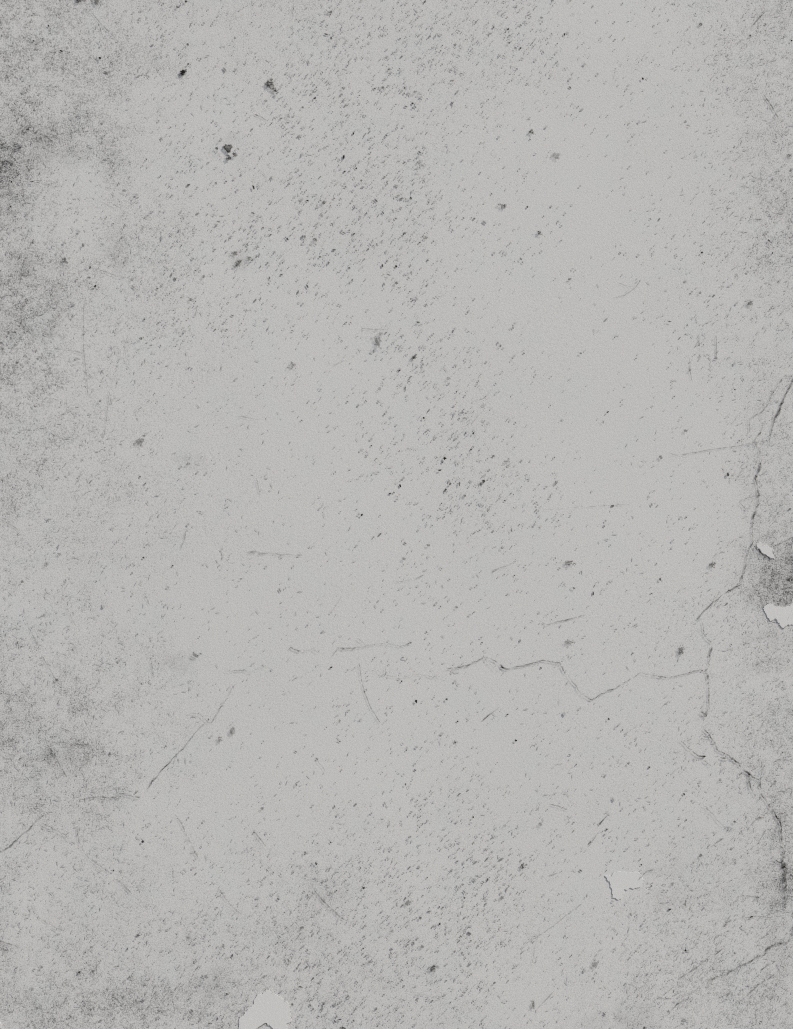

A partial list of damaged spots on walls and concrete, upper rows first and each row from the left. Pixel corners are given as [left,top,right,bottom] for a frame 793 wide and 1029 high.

peeling [756,542,774,559]
peeling [763,604,793,629]
crack [699,731,787,908]
peeling [238,989,293,1029]